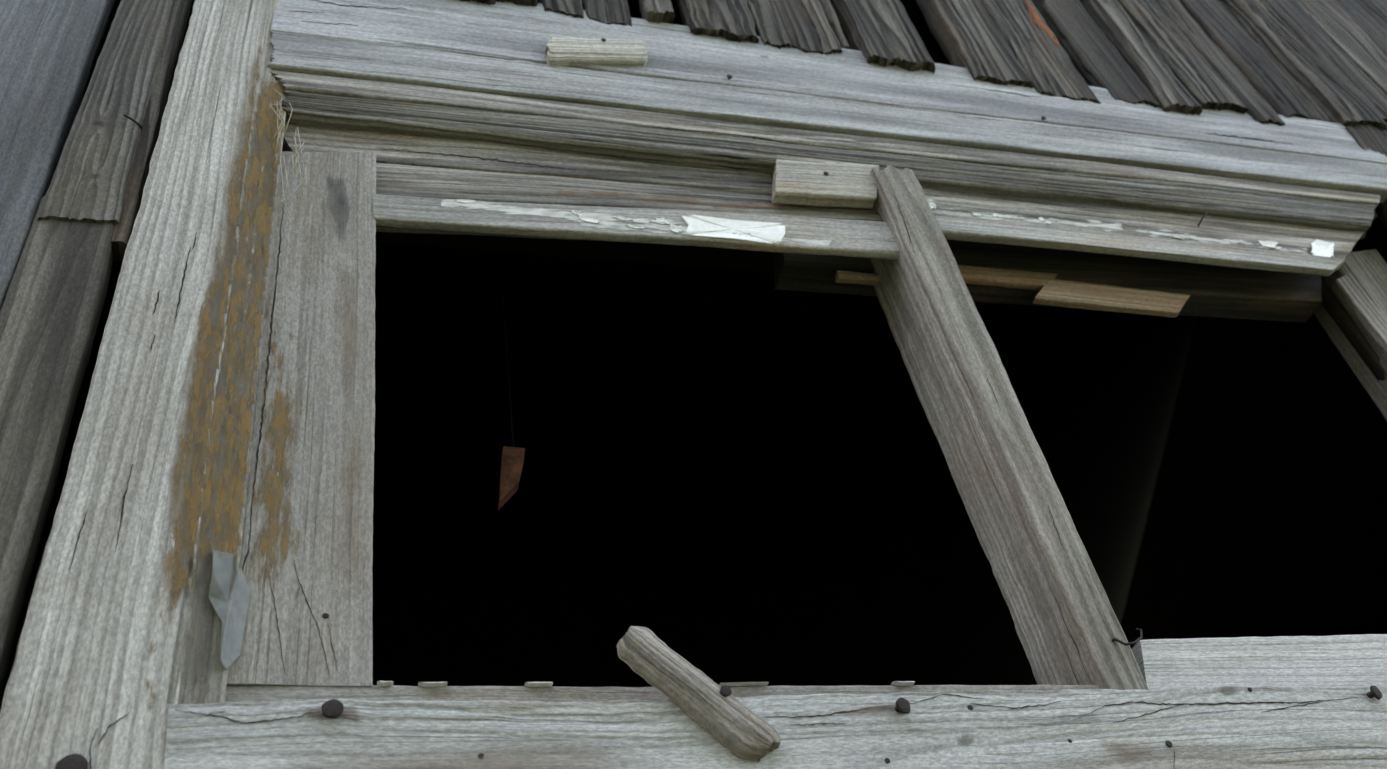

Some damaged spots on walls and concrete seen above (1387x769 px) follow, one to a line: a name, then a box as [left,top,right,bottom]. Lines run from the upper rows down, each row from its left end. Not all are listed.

peeling [441,199,832,248]
peeling [926,199,1334,258]
crack [242,204,338,678]
crack [175,709,363,724]
crack [765,709,865,726]
crack [910,694,1357,723]